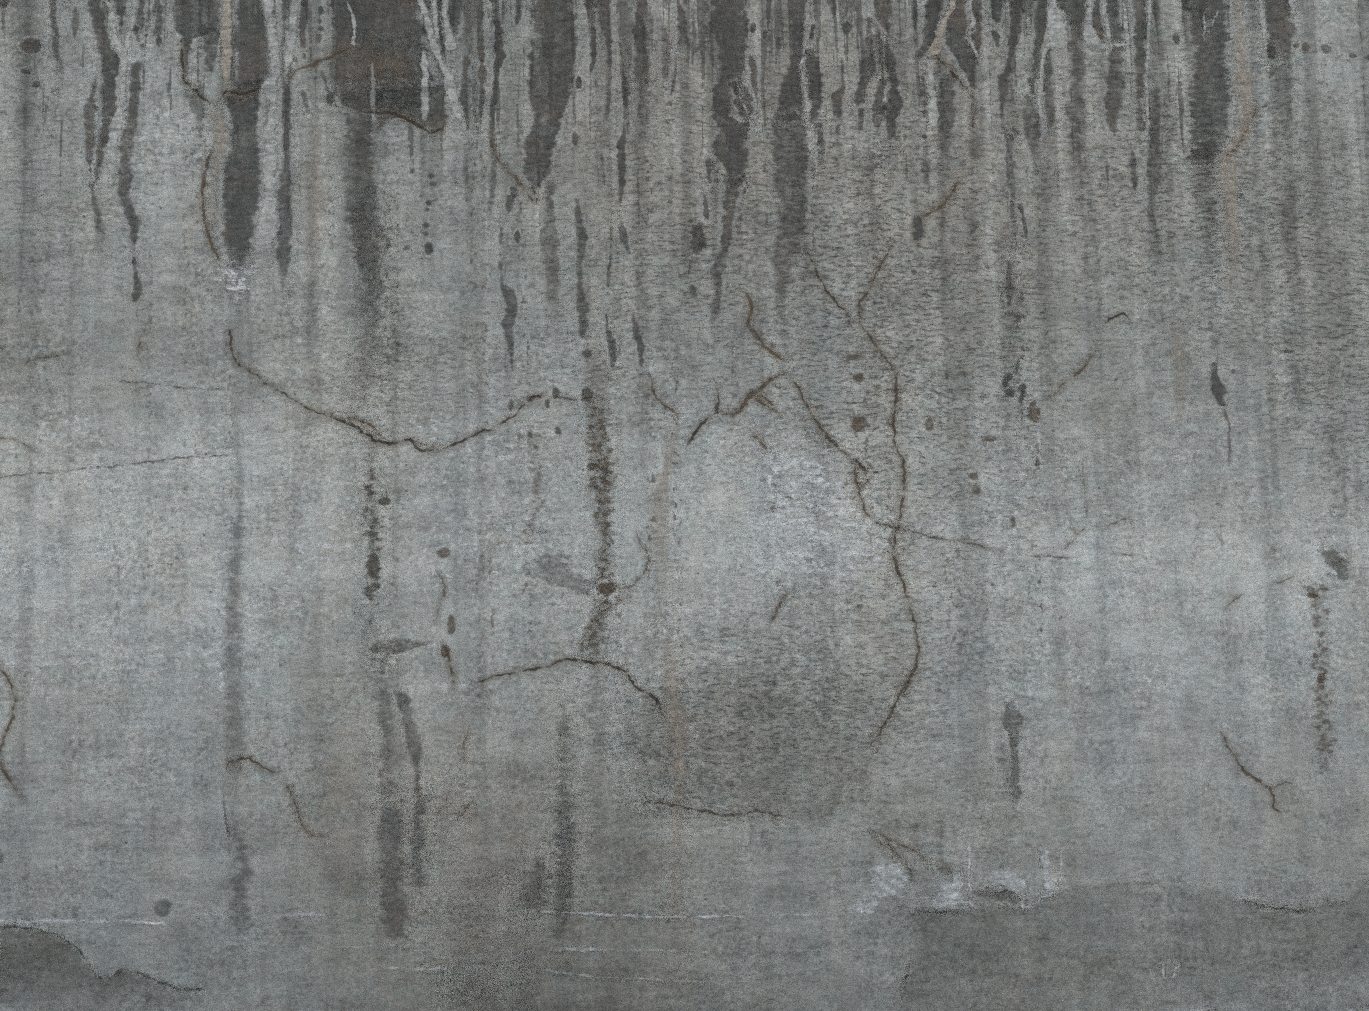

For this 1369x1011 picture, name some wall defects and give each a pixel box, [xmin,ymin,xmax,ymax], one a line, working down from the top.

leakage [20,0,676,302]
leakage [689,0,903,302]
leakage [913,0,1160,238]
leakage [1173,0,1331,224]
crack [122,330,593,452]
leakage [499,263,517,364]
leakage [575,201,591,357]
crack [650,181,983,743]
leakage [752,442,886,587]
leakage [1211,364,1235,452]
crack [436,540,662,713]
crack [0,670,16,790]